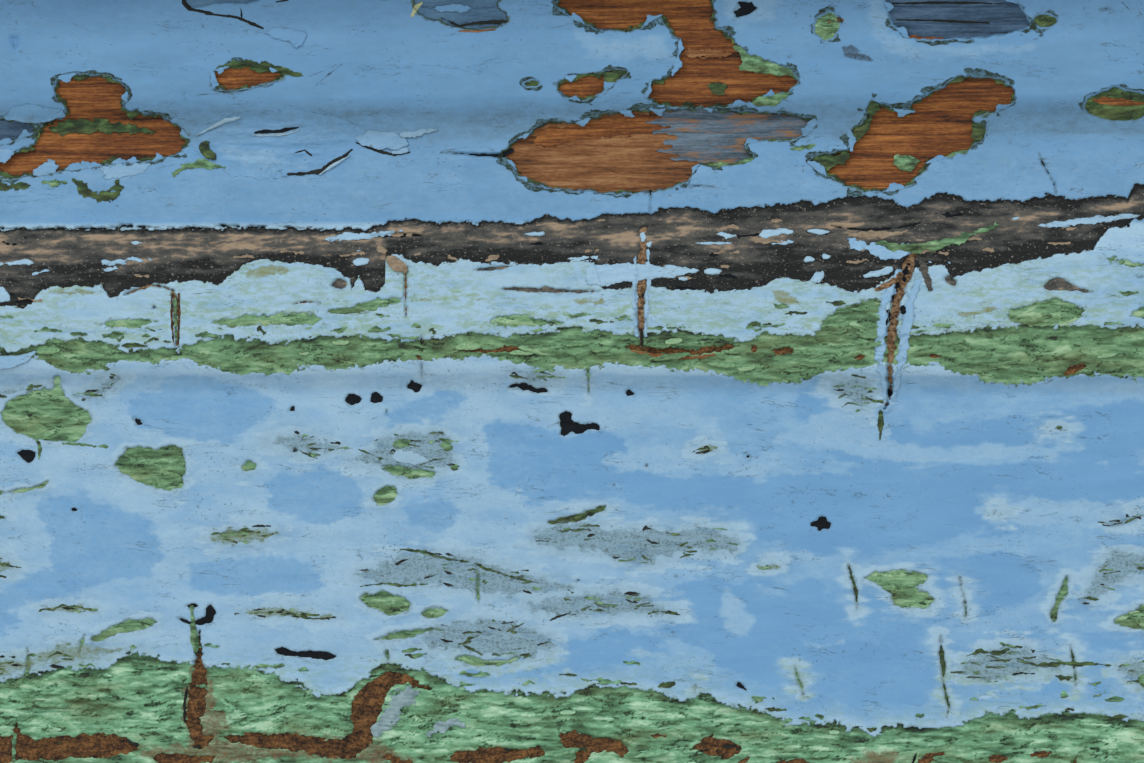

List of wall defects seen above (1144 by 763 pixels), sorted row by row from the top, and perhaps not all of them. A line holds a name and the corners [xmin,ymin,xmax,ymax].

peeling [0,0,1144,463]
crack [632,227,652,347]
crack [831,222,933,440]
peeling [0,481,48,495]
peeling [115,445,186,491]
peeling [242,461,256,471]
peeling [0,591,1144,763]